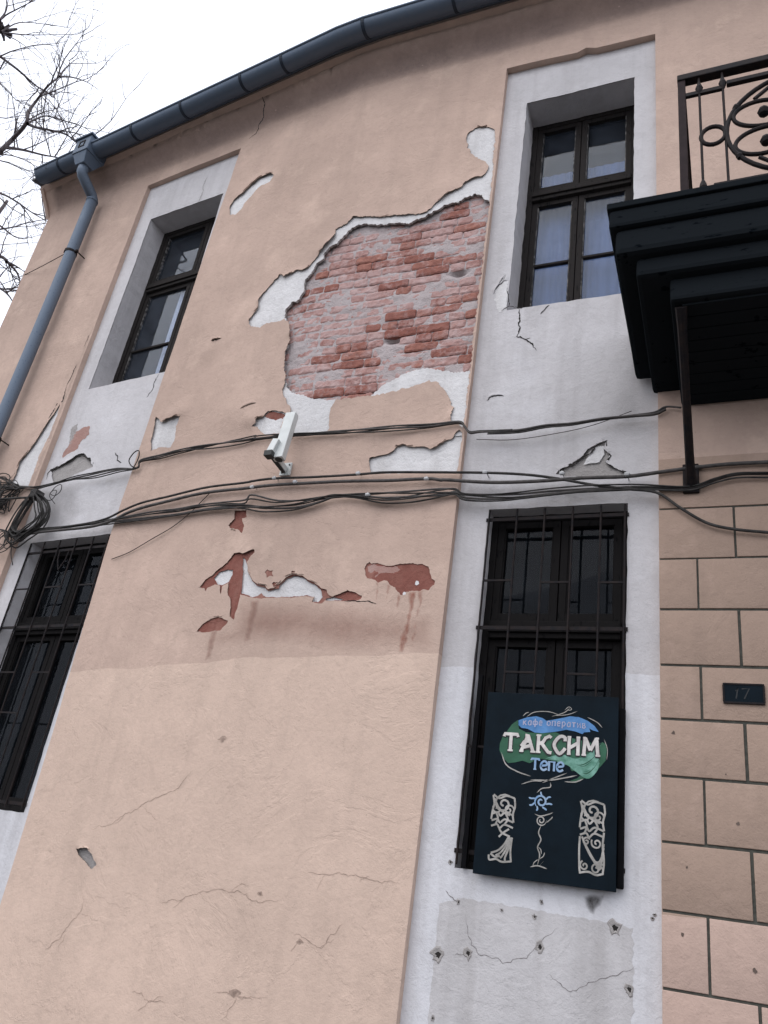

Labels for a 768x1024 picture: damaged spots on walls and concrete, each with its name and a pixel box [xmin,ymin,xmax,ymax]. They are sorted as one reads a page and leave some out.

peeling [230,172,274,215]
flaking render [249,125,508,474]
crack [495,274,549,349]
spalling [46,424,94,482]
spalling [556,441,626,477]
peeling [197,550,376,632]
peeling [365,562,435,595]
crack [99,771,192,827]
crack [158,883,277,906]
crack [308,872,395,889]
crack [456,926,554,964]
crack [549,967,634,992]